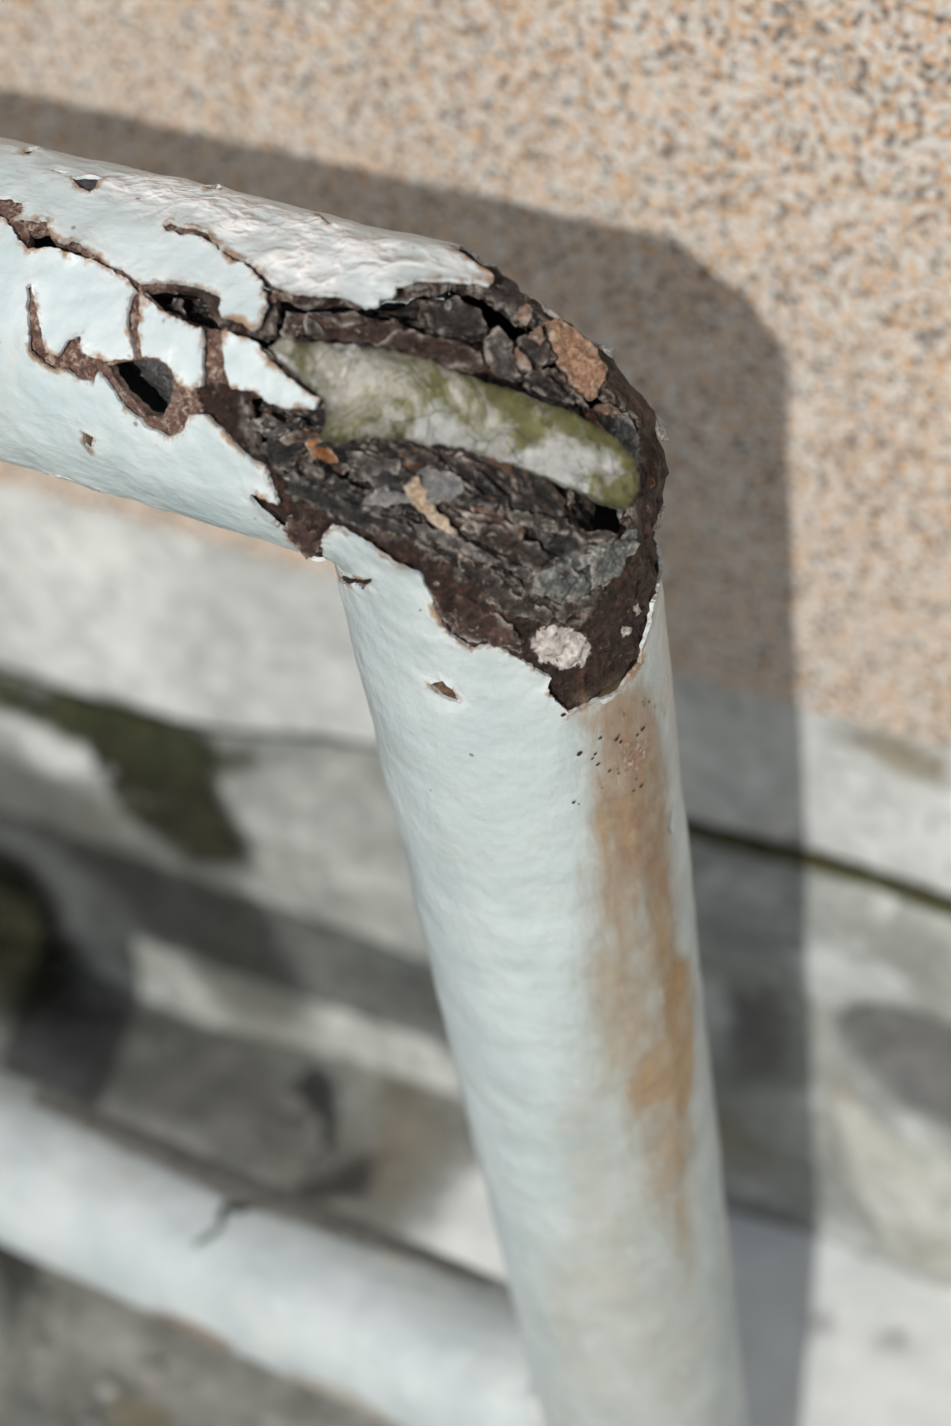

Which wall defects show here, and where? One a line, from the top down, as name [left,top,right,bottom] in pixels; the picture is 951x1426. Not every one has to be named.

peeling [73,179,98,192]
peeling [222,330,321,409]
corrosion [97,263,669,717]